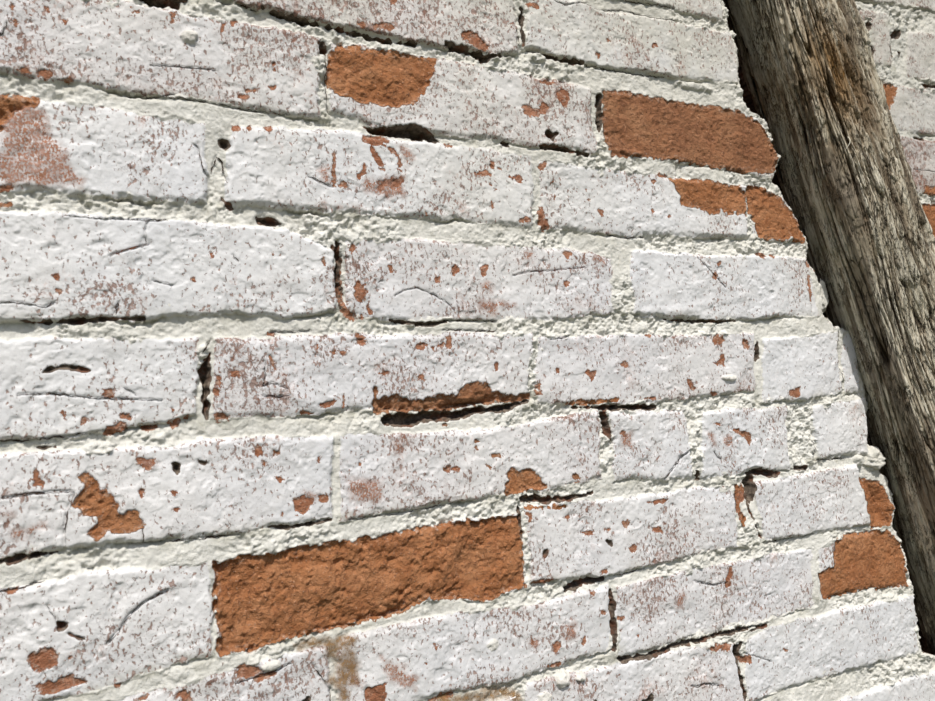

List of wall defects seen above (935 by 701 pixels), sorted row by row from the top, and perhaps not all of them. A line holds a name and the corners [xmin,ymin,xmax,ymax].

spalling [325,45,438,108]
spalling [597,90,805,244]
spalling [922,185,935,237]
peeling [300,393,345,415]
spalling [372,381,543,415]
peeling [254,444,280,466]
spalling [71,473,146,542]
peeling [293,491,329,516]
spalling [505,467,547,497]
spalling [819,478,909,599]
spalling [212,503,570,657]
peeling [234,663,277,683]